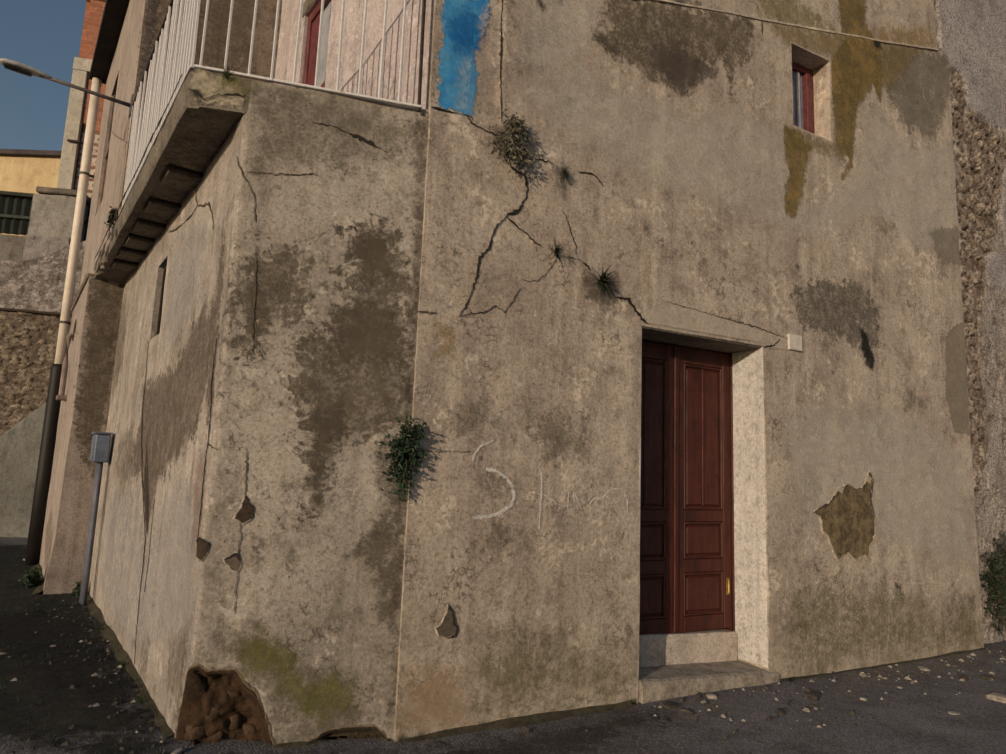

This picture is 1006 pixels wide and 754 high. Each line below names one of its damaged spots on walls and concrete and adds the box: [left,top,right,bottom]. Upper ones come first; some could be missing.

crack [73,74,245,303]
crack [414,0,591,315]
water stain [591,0,950,216]
water stain [130,221,225,533]
water stain [277,120,428,523]
crack [616,296,648,324]
water stain [790,277,881,357]
crack [134,342,155,665]
spalling [171,663,276,754]
flaking render [232,496,255,526]
flaking render [434,604,458,639]
flaking render [812,470,880,563]